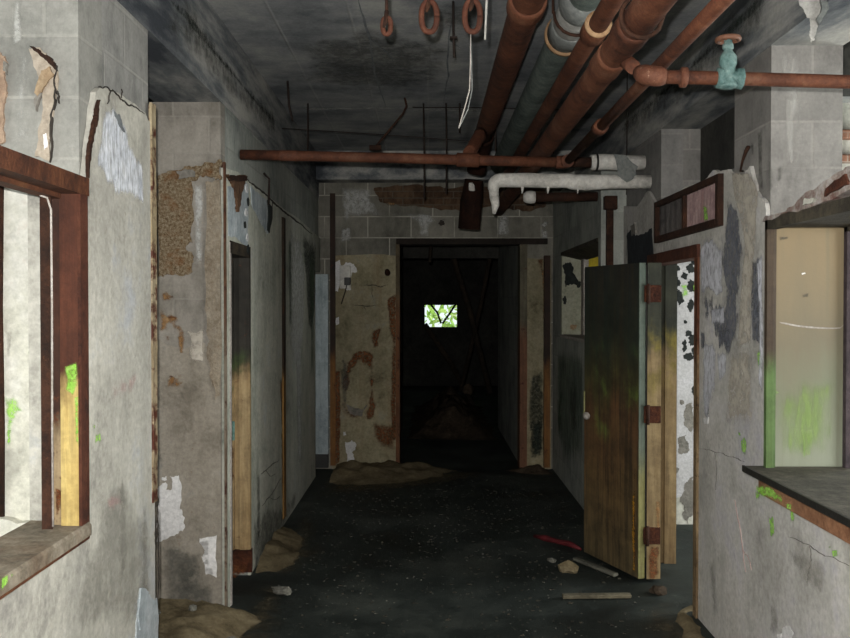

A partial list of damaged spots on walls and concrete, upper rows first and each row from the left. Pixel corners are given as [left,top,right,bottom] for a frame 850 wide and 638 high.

flaking render [29,46,59,161]
crack [99,86,144,114]
flaking render [762,166,850,222]
flaking render [157,159,273,400]
water stain [728,141,762,418]
rust [161,314,184,353]
rust [336,295,396,464]
water stain [529,375,543,456]
peeling [676,204,742,521]
peeling [157,475,185,542]
peeling [199,535,217,577]
crack [790,537,849,580]